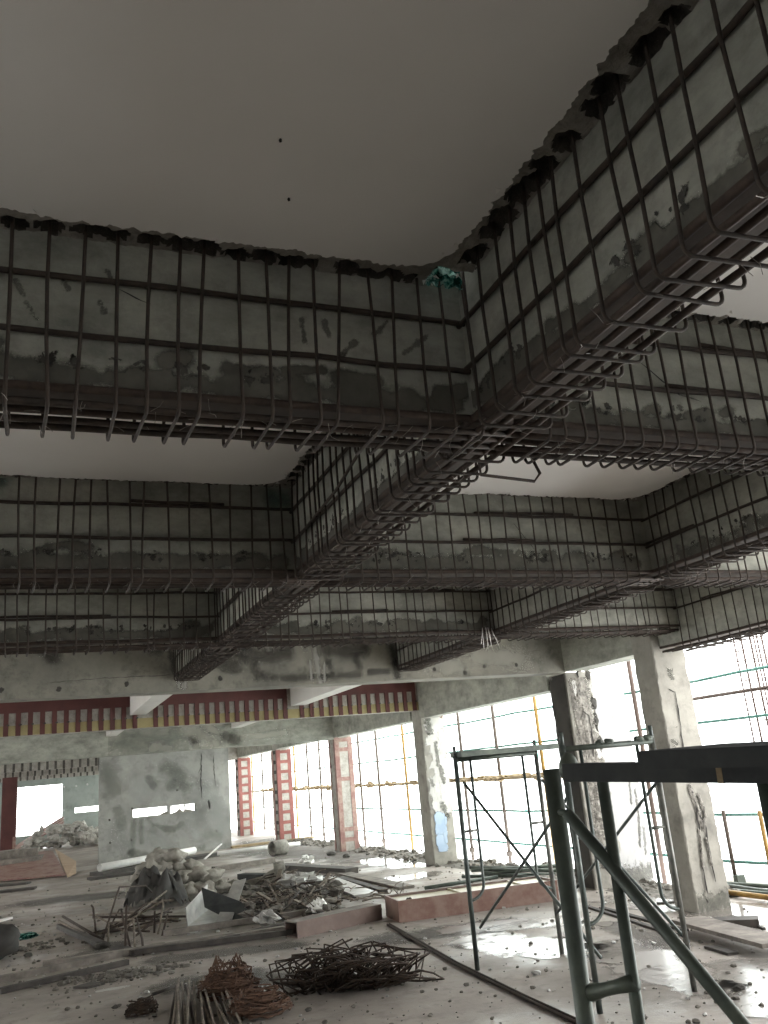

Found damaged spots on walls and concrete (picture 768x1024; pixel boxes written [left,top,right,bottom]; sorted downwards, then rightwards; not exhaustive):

peeling [0,127,768,414]
peeling [533,394,768,437]
flaking render [0,432,337,489]
flaking render [463,469,704,502]
peeling [0,540,289,569]
peeling [337,544,642,570]
peeling [0,620,215,642]
peeling [252,616,488,635]
spalling [569,671,603,763]
spalling [587,782,606,847]